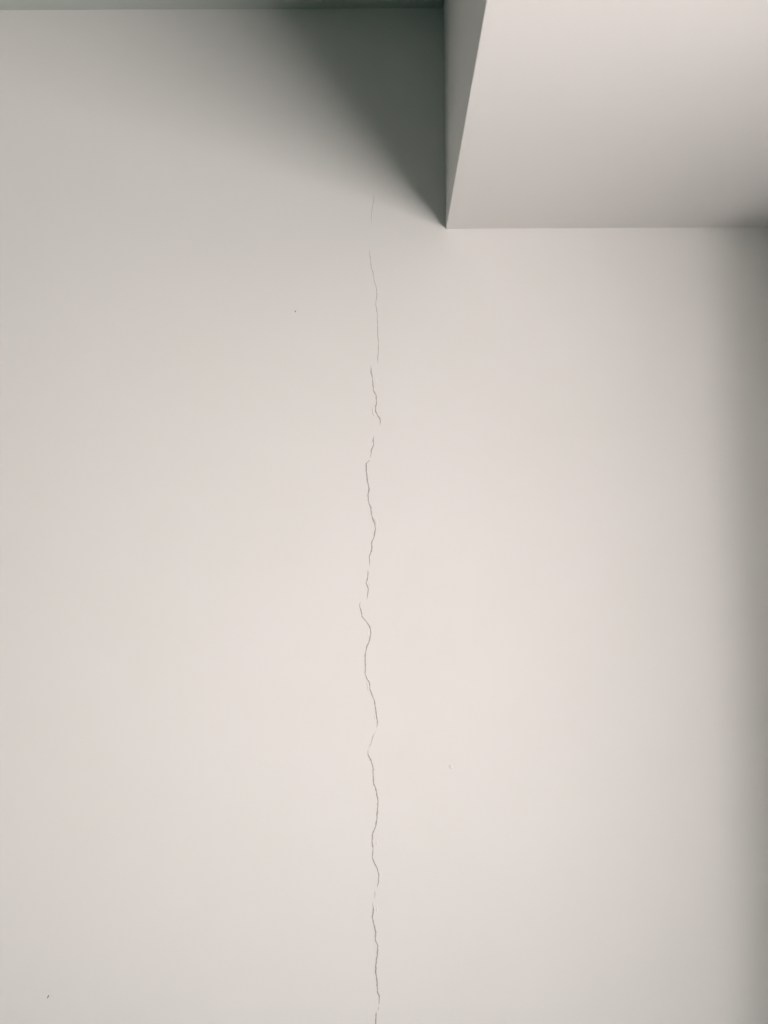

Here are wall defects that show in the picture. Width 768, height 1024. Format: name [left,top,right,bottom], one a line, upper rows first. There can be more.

crack [359,252,381,1024]